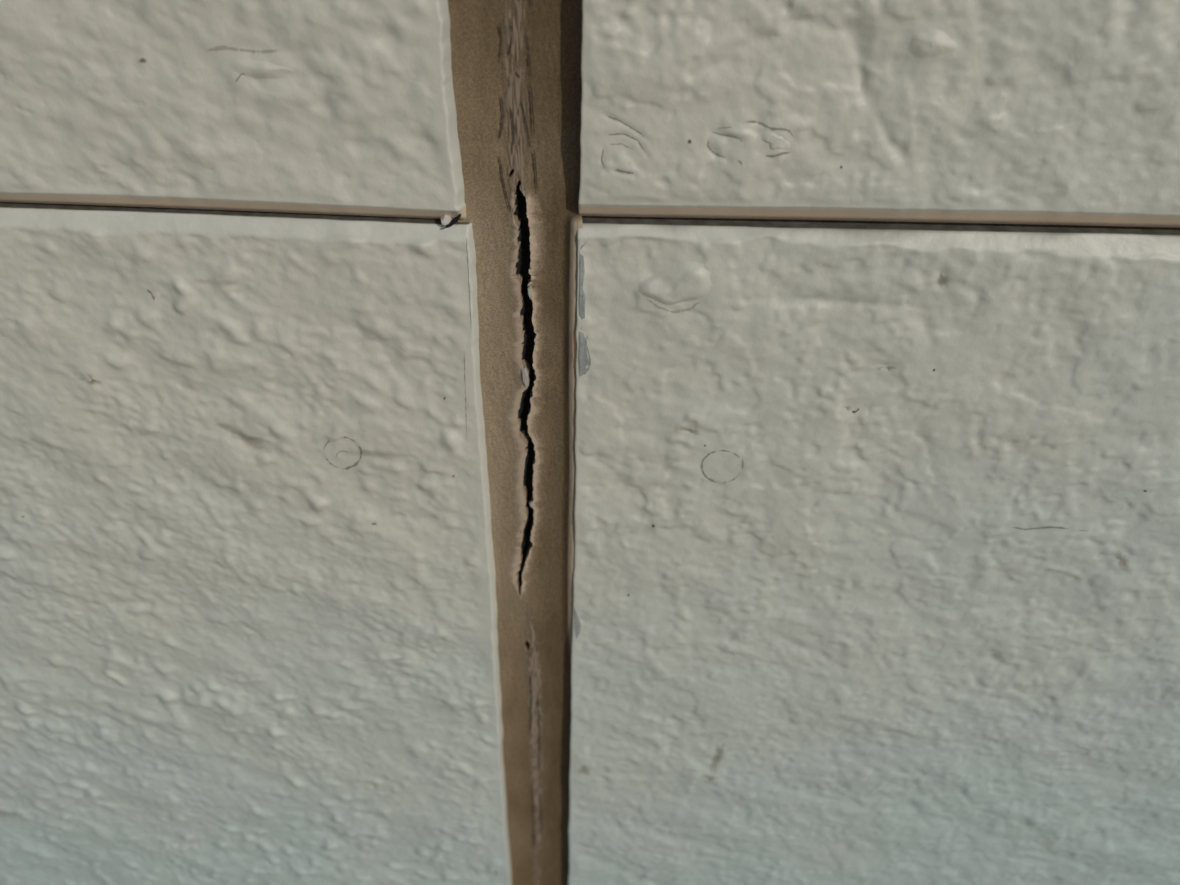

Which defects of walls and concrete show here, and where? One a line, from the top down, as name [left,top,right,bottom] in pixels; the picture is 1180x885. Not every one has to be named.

crack [507,169,541,599]